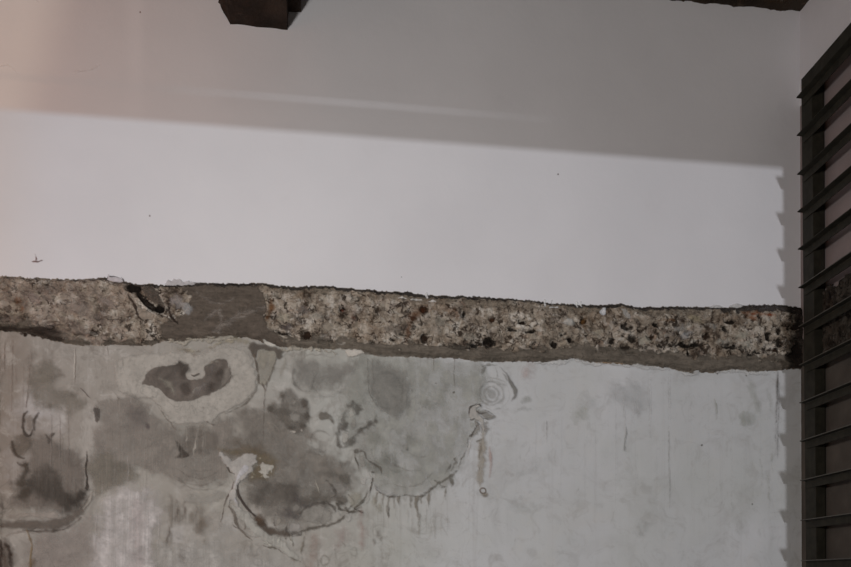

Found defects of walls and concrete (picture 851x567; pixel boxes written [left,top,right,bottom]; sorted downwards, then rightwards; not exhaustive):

leakage [249,342,282,391]
spalling [0,275,804,376]
leakage [0,358,489,560]